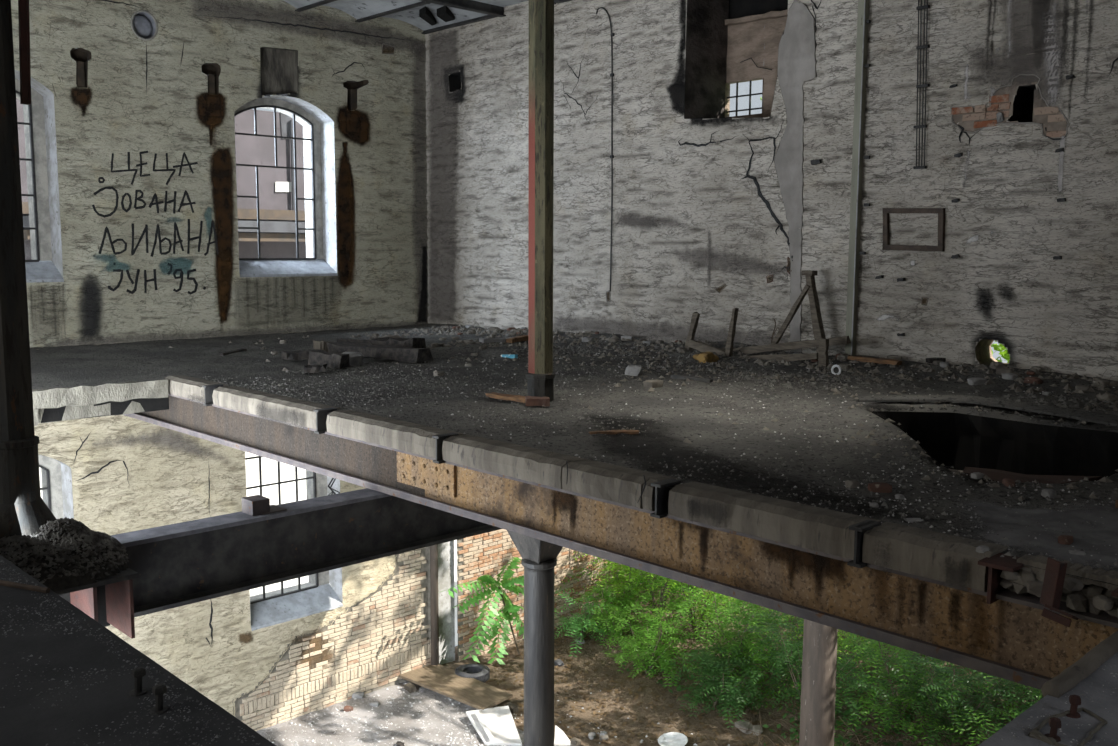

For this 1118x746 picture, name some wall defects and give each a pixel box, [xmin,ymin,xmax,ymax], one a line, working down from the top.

water stain [965,0,1093,112]
flaking render [950,74,1069,138]
crack [678,123,793,279]
crack [73,432,129,483]
spalling [872,411,1118,482]